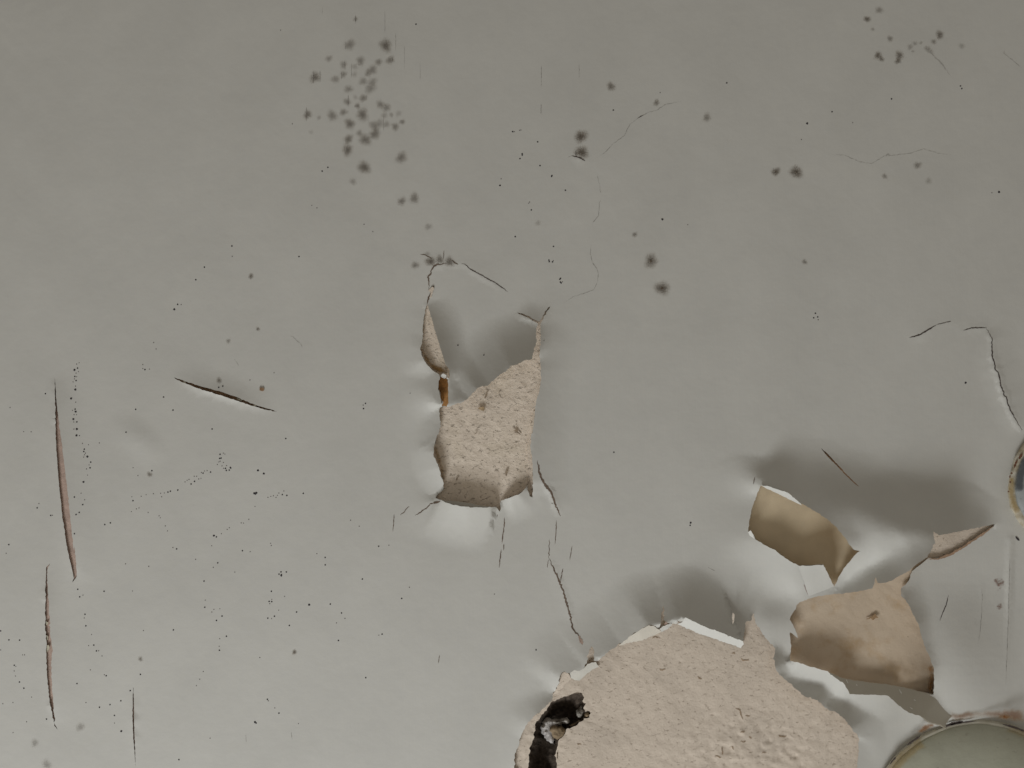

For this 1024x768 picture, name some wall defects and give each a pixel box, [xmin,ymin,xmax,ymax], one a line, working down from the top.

crack [421,252,506,304]
peeling [420,271,550,511]
crack [910,321,1021,428]
crack [537,461,583,644]
peeling [514,486,994,768]